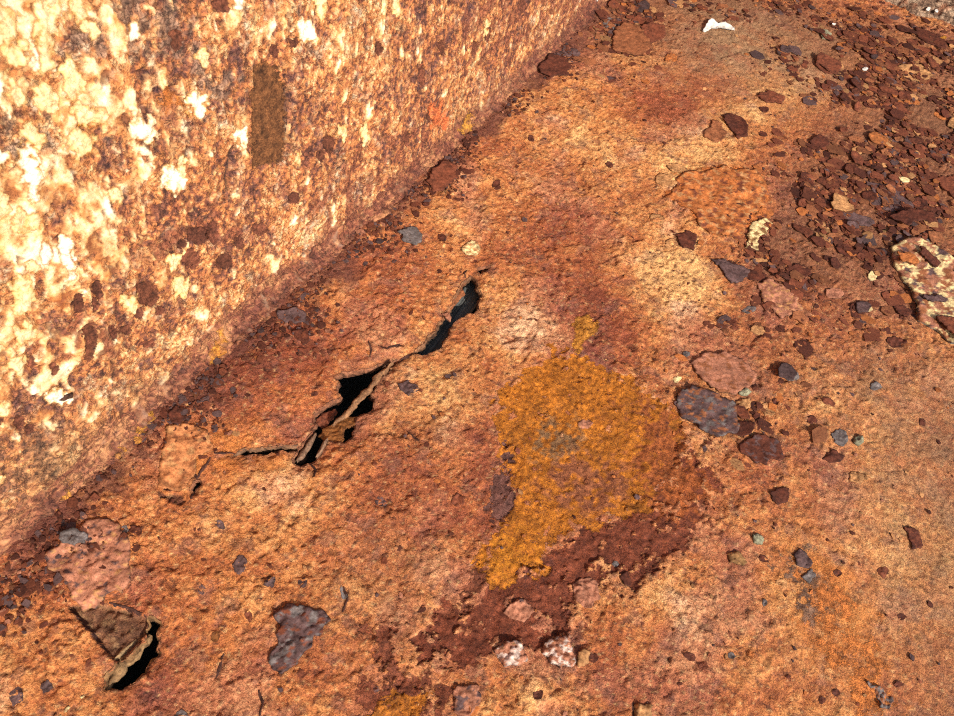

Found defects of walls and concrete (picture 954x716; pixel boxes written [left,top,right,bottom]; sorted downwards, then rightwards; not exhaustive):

corrosion [757,89,785,113]
corrosion [665,230,697,251]
corrosion [711,258,812,283]
corrosion [816,177,941,269]
corrosion [892,290,948,318]
crack [189,266,490,499]
corrosion [731,398,785,465]
corrosion [822,429,848,463]
corrosion [355,314,724,716]
corrosion [232,555,247,575]
corrosion [268,603,331,679]
corrosion [727,543,897,716]